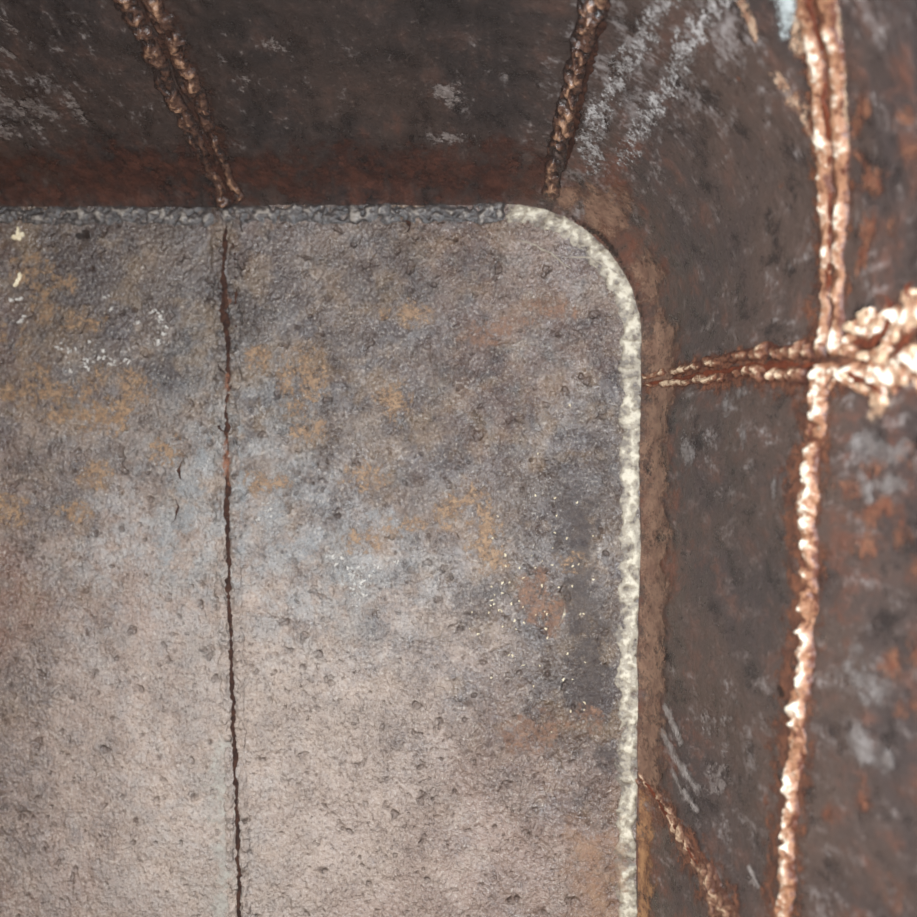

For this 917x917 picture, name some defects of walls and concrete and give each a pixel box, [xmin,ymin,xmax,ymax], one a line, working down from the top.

crack [564,0,609,170]
damp [575,0,681,176]
damp [617,0,736,166]
crack [806,0,832,167]
crack [645,360,817,385]
crack [824,192,832,318]
crack [843,371,884,394]
crack [849,281,915,369]
crack [217,226,242,917]
crack [639,778,698,864]